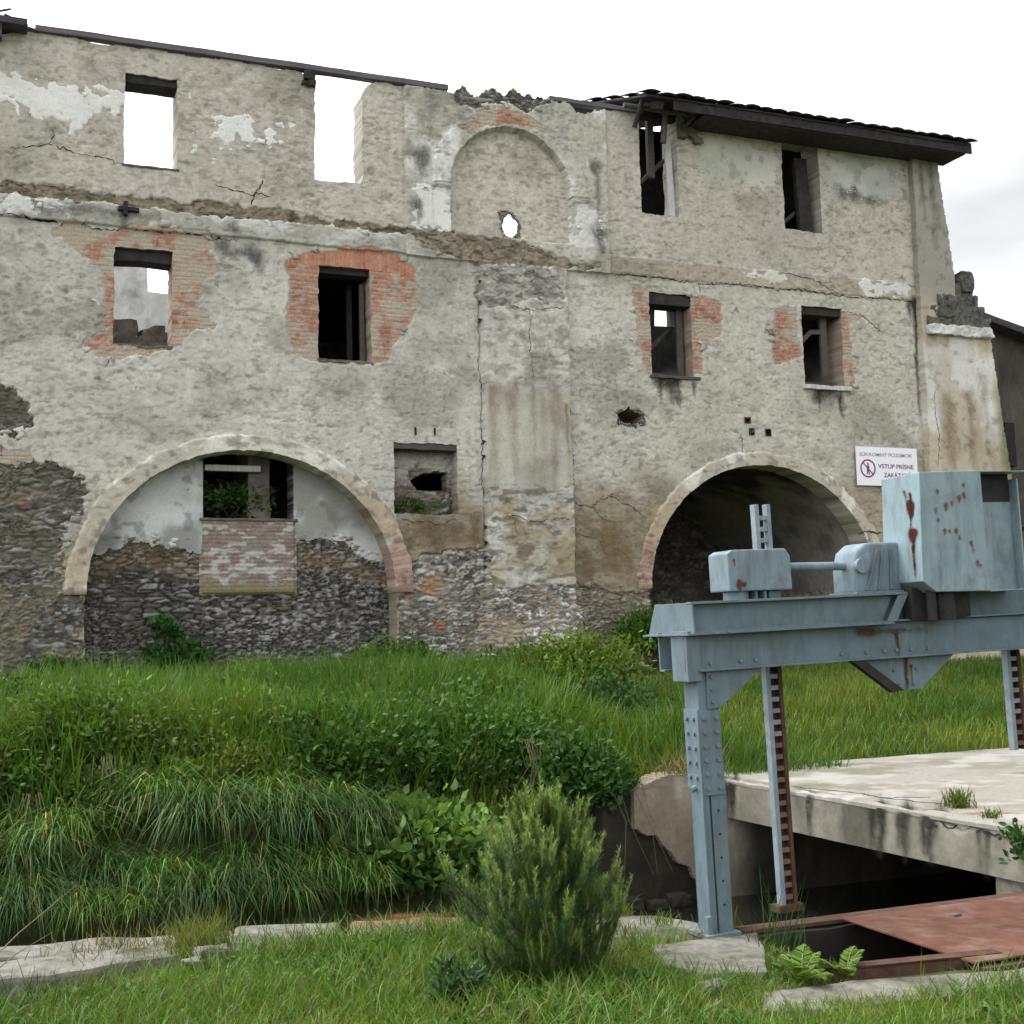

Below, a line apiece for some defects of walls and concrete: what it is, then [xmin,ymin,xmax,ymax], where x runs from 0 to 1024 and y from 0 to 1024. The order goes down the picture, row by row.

crack [9,130,121,164]
crack [215,180,270,205]
spalling [0,180,610,365]
crack [477,280,644,569]
water stain [655,369,679,396]
spalling [0,384,89,676]
rust [903,491,917,576]
rust [935,483,982,567]
spalling [392,544,652,675]
rust [893,629,913,687]
water stain [869,799,913,852]
water stain [921,804,947,859]